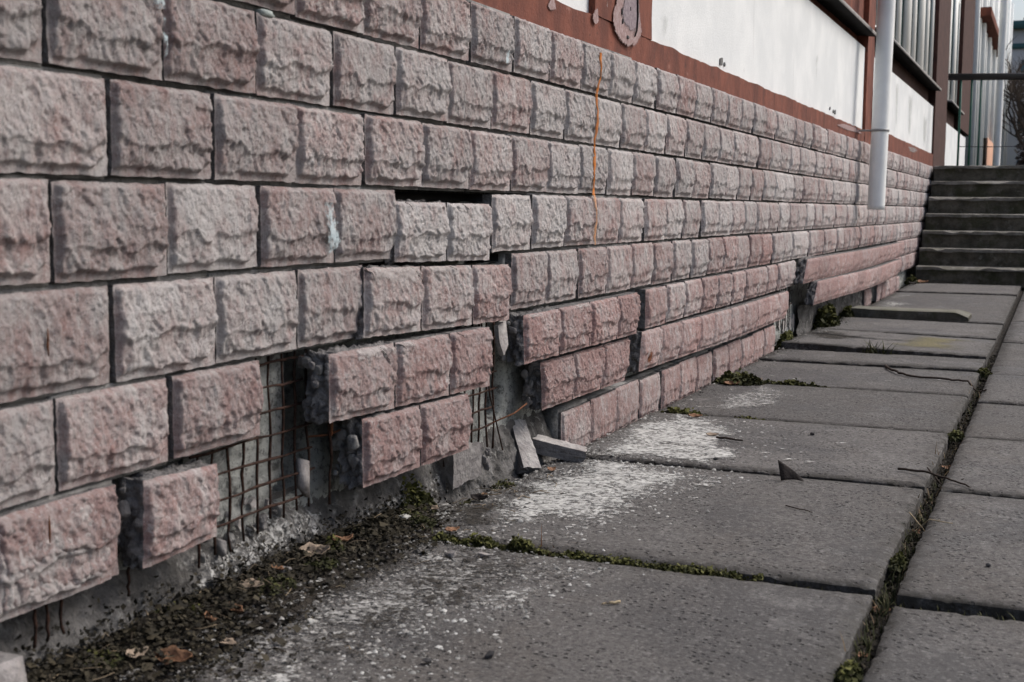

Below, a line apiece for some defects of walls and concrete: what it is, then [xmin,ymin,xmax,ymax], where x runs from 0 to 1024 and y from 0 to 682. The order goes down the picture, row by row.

corrosion [592,53,602,245]
spalling [117,480,131,546]
spalling [183,348,359,568]
spalling [458,321,537,471]
spalling [32,598,66,649]